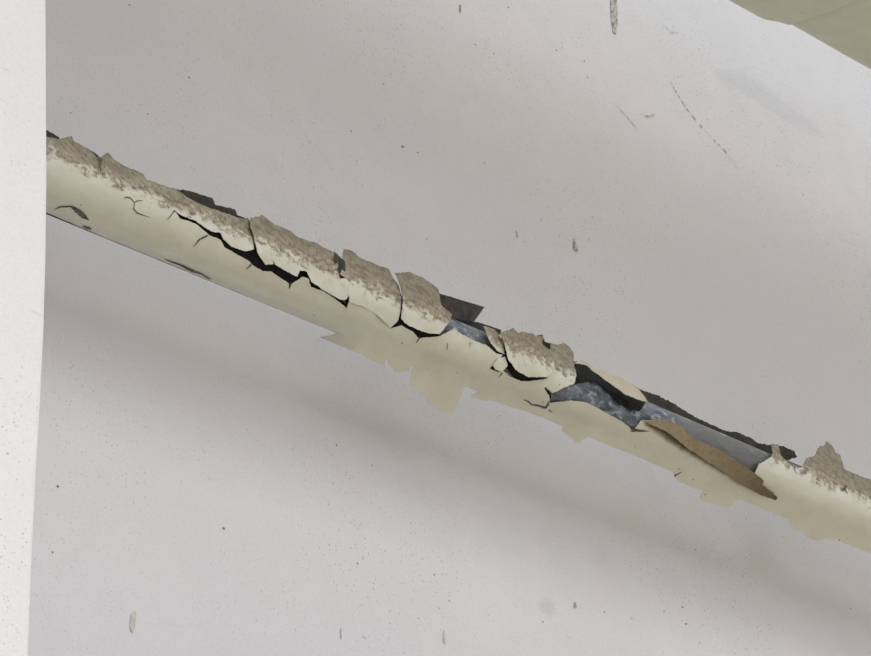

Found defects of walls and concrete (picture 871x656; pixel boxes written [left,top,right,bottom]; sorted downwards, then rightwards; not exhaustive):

crack [54,206,92,230]
crack [124,197,348,308]
peeling [177,189,554,377]
peeling [321,333,526,413]
peeling [574,360,797,500]
peeling [673,471,740,508]